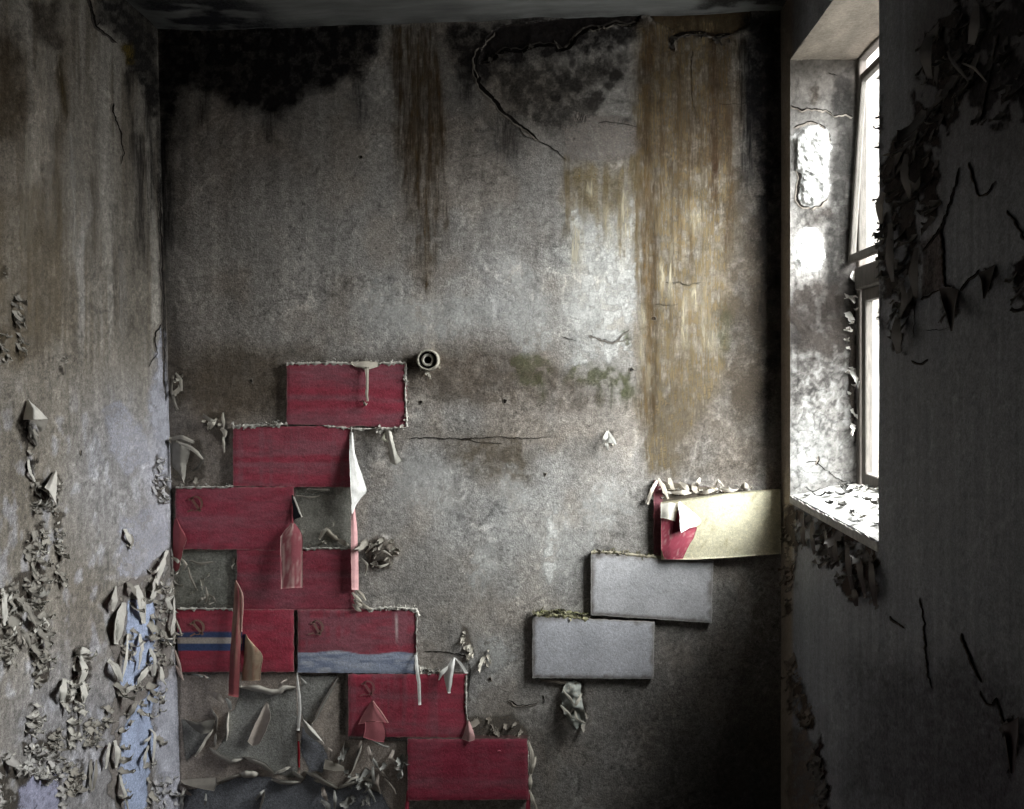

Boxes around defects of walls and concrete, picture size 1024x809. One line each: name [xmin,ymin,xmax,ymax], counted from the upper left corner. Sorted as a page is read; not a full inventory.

crack [472,31,565,159]
damp [447,16,648,155]
damp [97,0,381,361]
spalling [791,124,833,207]
peeling [871,0,1024,355]
rust [634,18,737,473]
crack [411,436,541,444]
damp [405,353,580,404]
peeling [0,399,409,809]
peeling [777,503,881,618]
crack [889,598,931,687]
crack [960,633,1005,723]